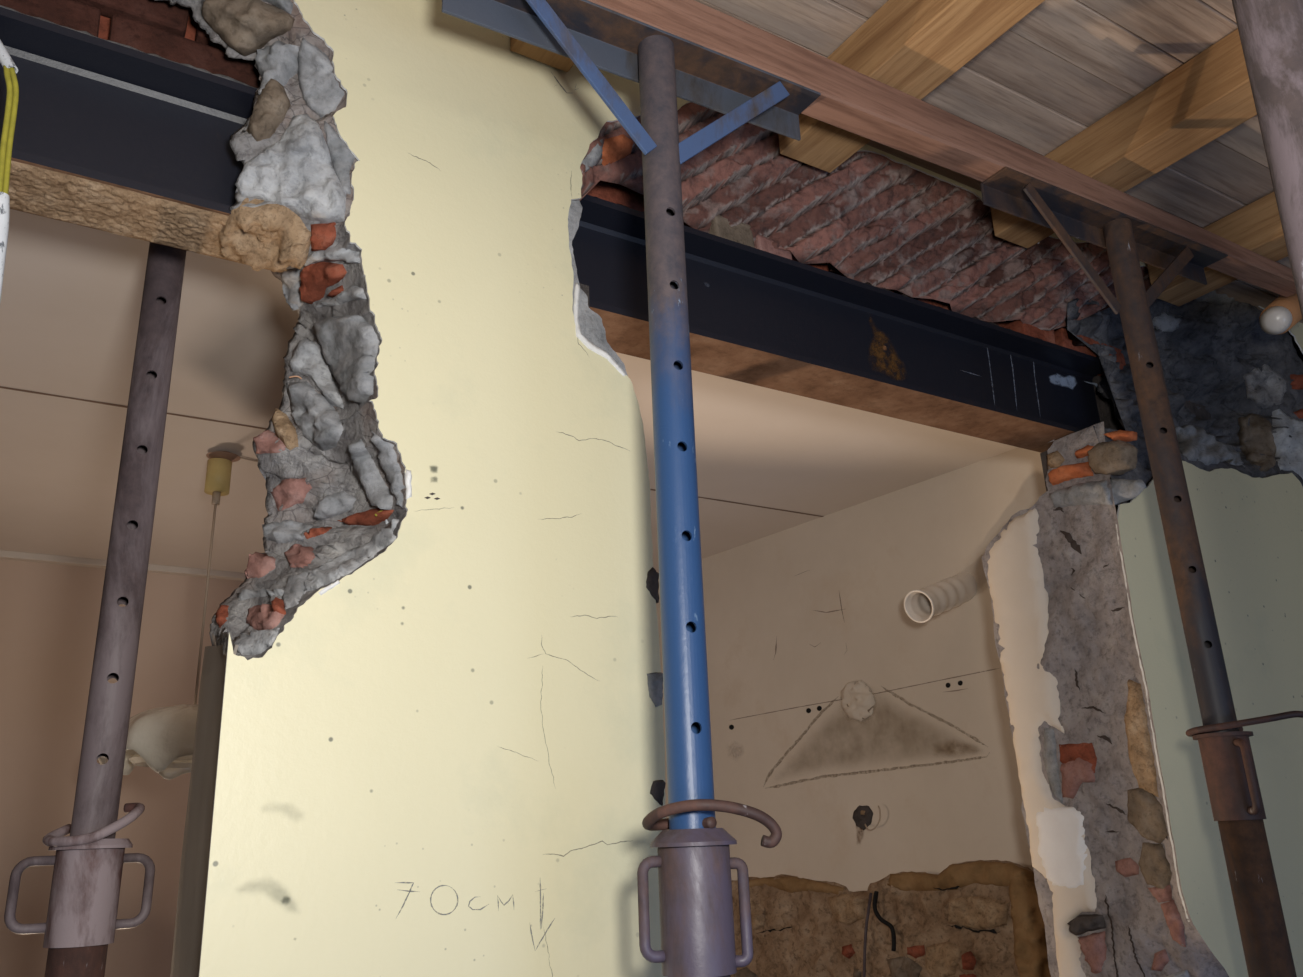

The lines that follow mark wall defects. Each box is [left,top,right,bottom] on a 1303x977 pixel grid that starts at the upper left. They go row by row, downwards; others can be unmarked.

flaking render [677,102,725,143]
spalling [156,0,412,660]
flaking render [568,115,644,376]
flaking render [680,122,1152,484]
spalling [1141,267,1303,486]
crack [500,642,598,789]
crack [543,840,633,857]
peeling [730,860,1051,977]